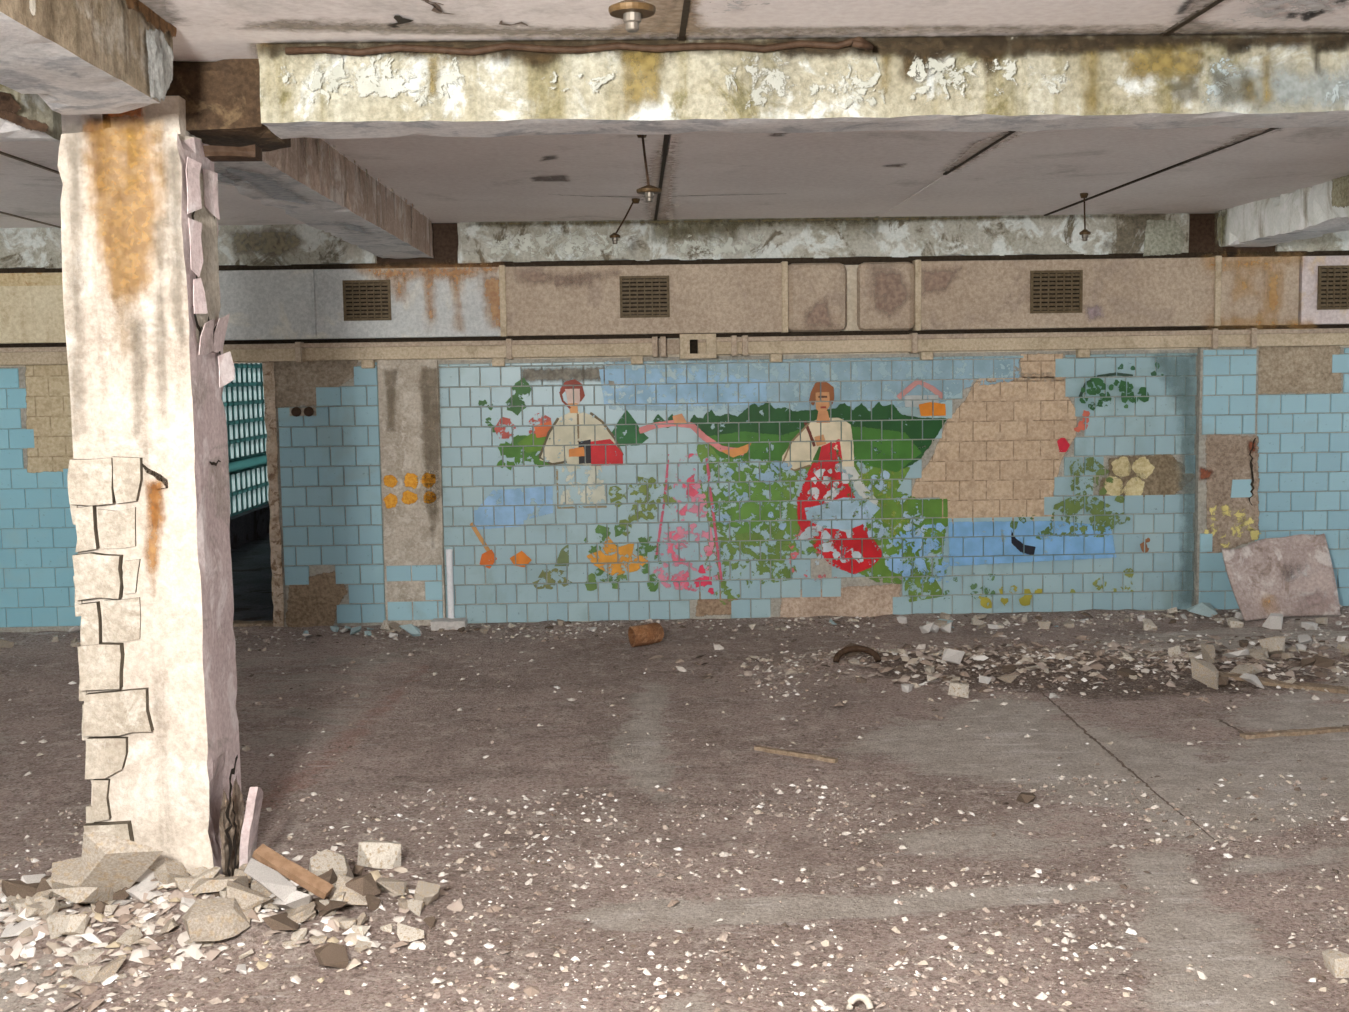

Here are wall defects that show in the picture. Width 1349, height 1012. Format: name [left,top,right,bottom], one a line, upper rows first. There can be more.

peeling [280,54,466,108]
peeling [542,64,621,94]
peeling [716,52,885,113]
peeling [907,52,1072,113]
peeling [1202,57,1248,108]
rust [88,108,155,294]
peeling [912,353,1077,523]
peeling [1098,433,1261,553]
peeling [285,571,347,627]
crack [1029,677,1220,844]
spalling [219,754,263,877]